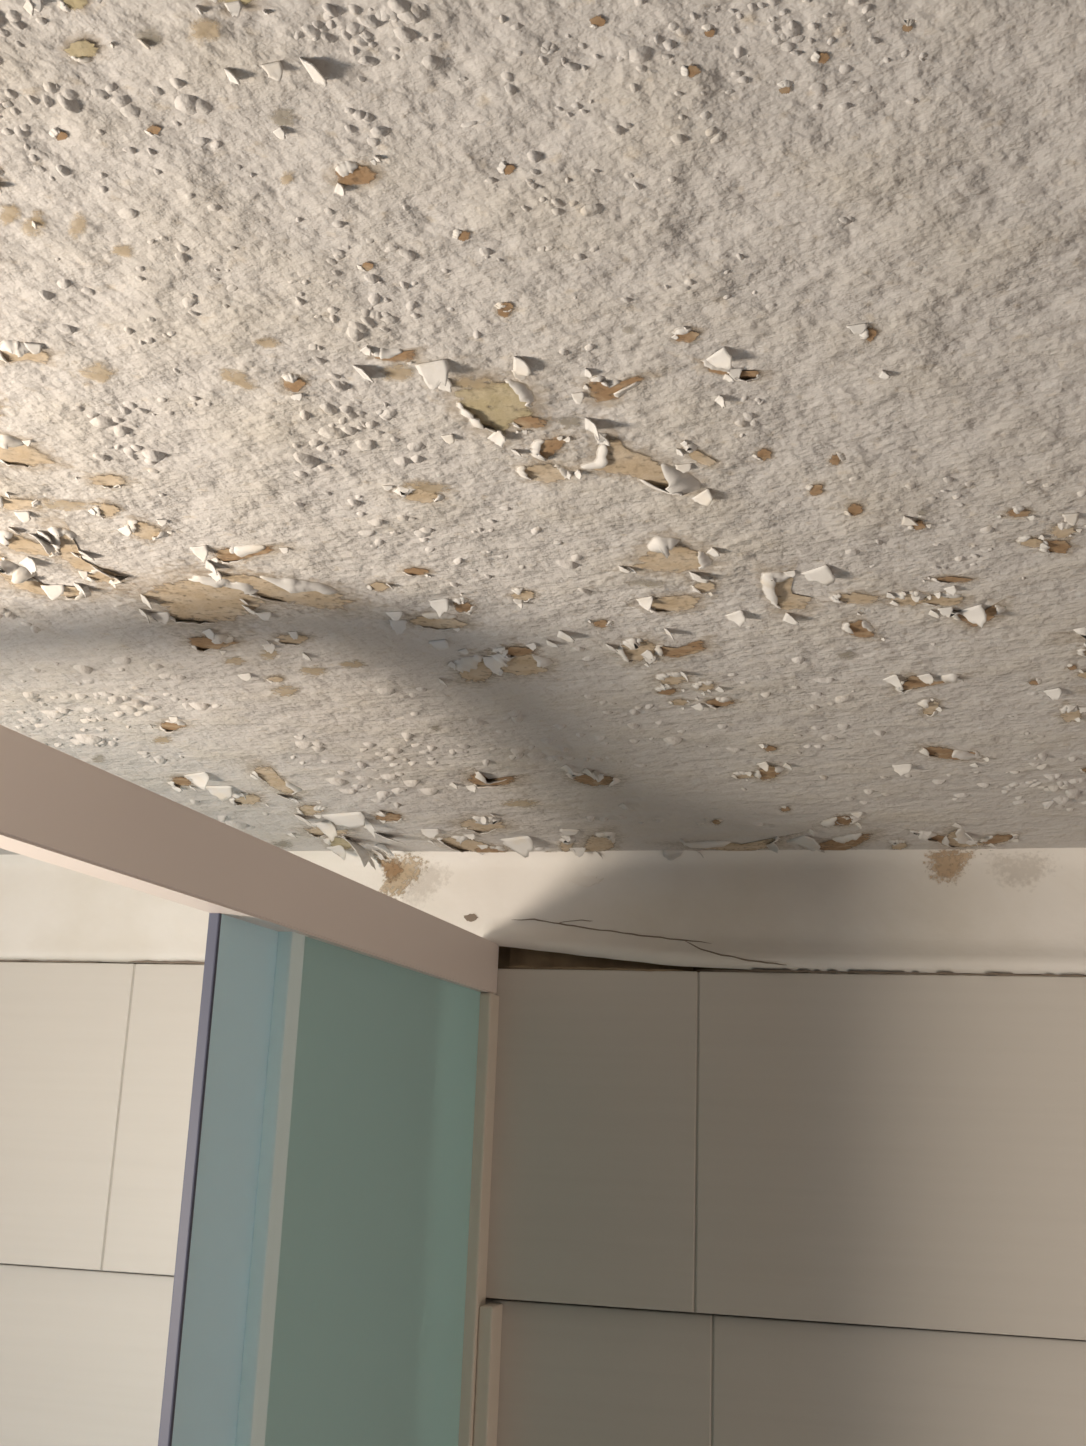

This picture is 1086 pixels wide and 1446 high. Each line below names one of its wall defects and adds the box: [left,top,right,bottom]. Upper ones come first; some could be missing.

peeling [299,57,327,87]
peeling [700,347,763,409]
peeling [353,346,717,506]
peeling [0,475,172,600]
peeling [139,545,363,696]
peeling [386,593,575,687]
peeling [588,536,734,711]
peeling [760,565,1007,658]
peeling [168,767,428,897]
peeling [421,771,536,858]
leakage [924,850,973,883]
crack [514,918,783,965]